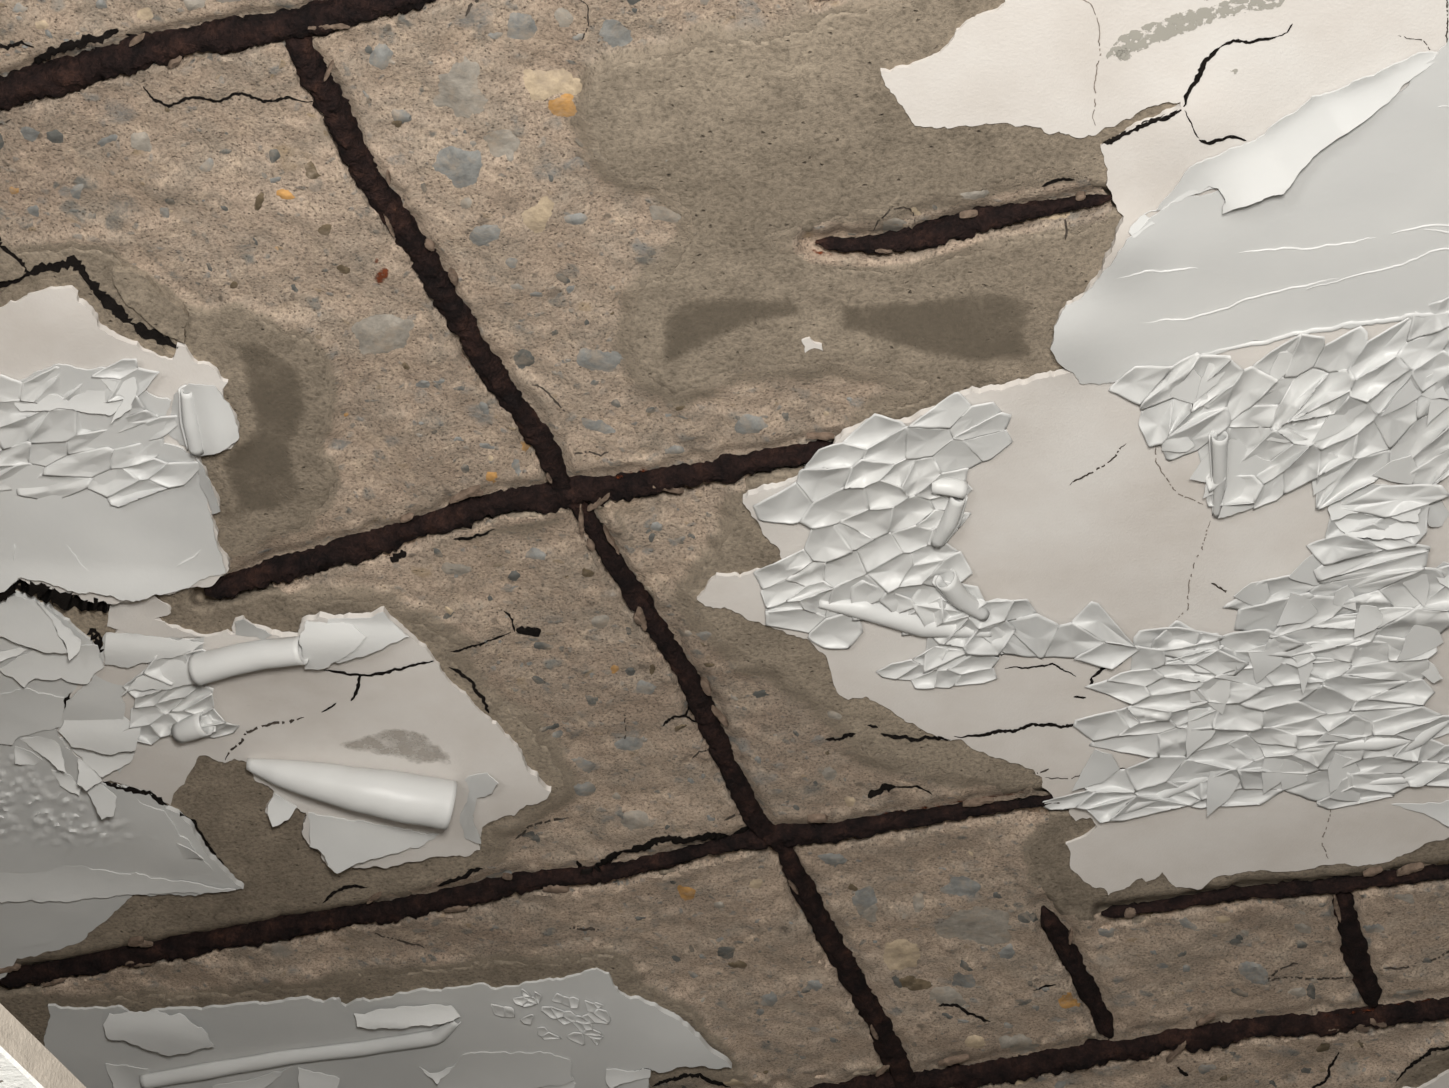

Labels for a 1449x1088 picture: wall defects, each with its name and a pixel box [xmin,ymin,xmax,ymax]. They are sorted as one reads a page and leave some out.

crack [0,28,133,65]
crack [1084,0,1293,145]
crack [0,237,178,349]
spalling [0,0,931,604]
water stain [668,302,794,357]
water stain [846,299,1025,358]
water stain [228,350,301,507]
peeling [697,0,1449,895]
crack [0,579,110,653]
crack [225,611,541,760]
peeling [0,432,1449,1088]
crack [825,654,1123,742]